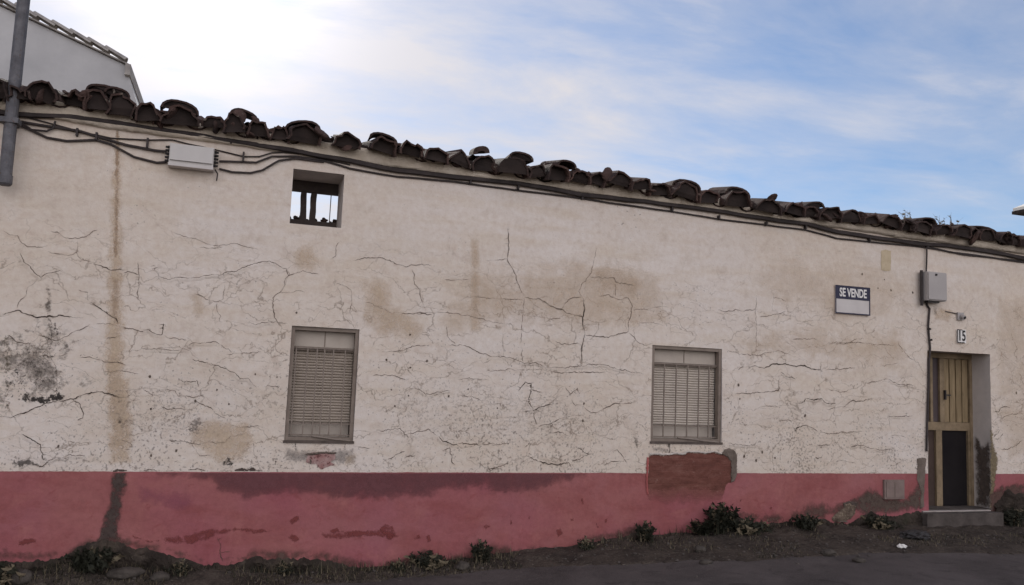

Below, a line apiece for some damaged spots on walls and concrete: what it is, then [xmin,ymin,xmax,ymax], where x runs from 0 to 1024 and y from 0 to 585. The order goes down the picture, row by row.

water stain [107,131,129,459]
water stain [4,323,68,406]
crack [3,230,666,470]
crack [723,297,915,464]
water stain [98,473,127,541]
flaking render [0,528,367,573]
flaking render [305,451,337,469]
peeling [324,526,395,539]
water stain [197,424,574,496]
peeling [646,448,776,500]
flaking render [816,458,926,526]
water stain [975,430,998,508]